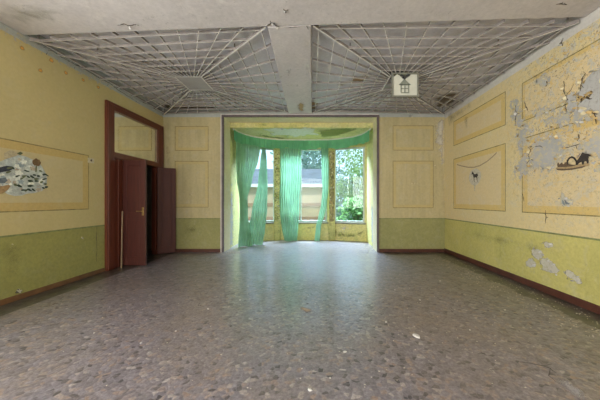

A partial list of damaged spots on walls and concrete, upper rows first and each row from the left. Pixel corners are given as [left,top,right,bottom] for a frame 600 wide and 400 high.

crack [546,73,597,124]
peeling [509,67,600,182]
spalling [526,242,582,284]